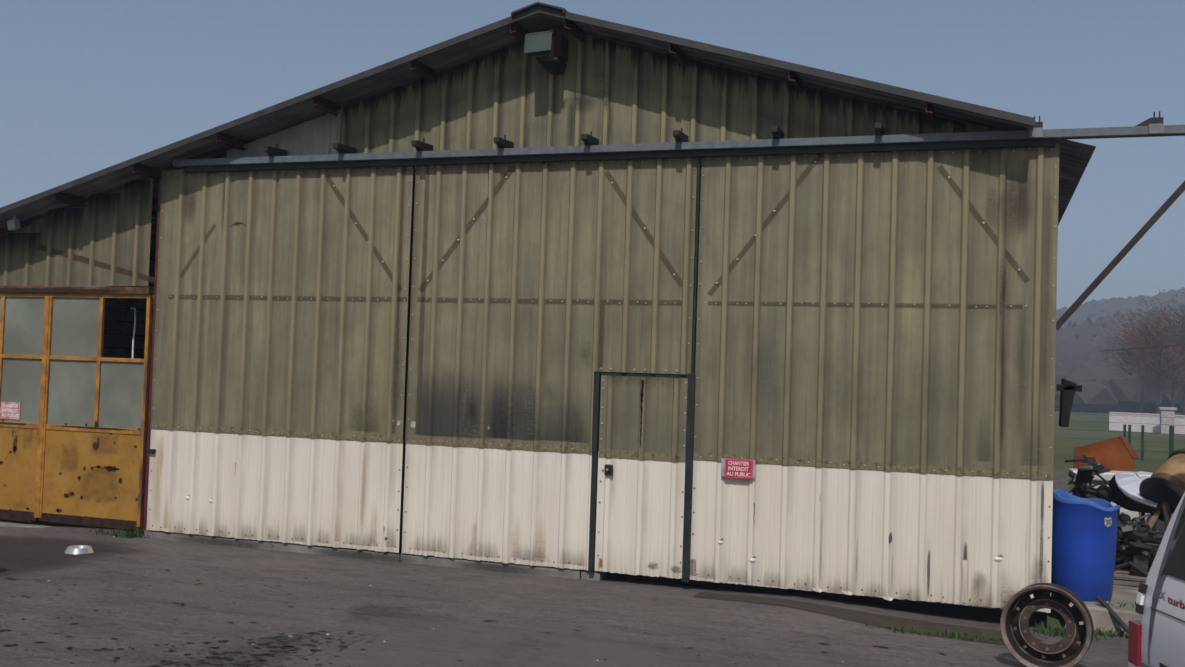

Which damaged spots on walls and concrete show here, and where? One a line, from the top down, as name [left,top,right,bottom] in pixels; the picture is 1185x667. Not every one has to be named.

rust [0,419,38,464]
rust [62,421,141,450]
rust [52,466,131,530]